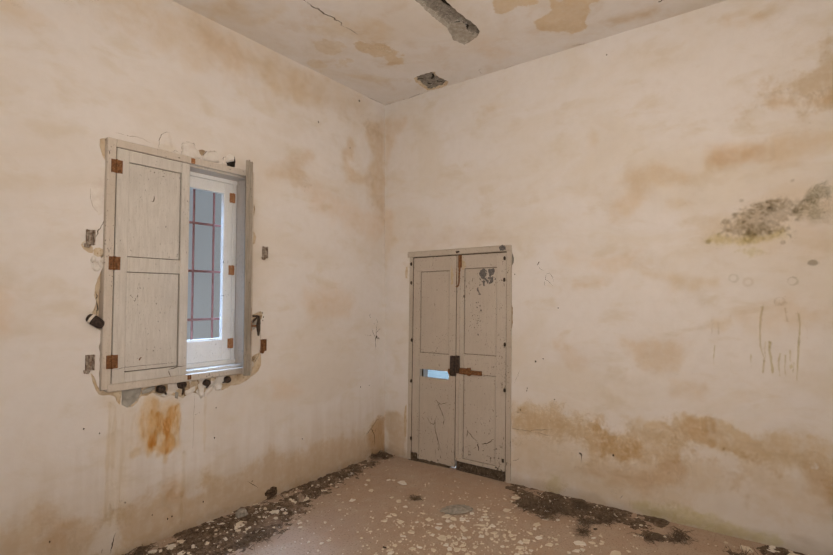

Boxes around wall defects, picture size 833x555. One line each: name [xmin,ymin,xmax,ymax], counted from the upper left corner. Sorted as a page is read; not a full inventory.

flaking render [414,72,448,90]
peeling [181,142,236,167]
flaking render [81,241,103,317]
flaking render [91,354,261,408]